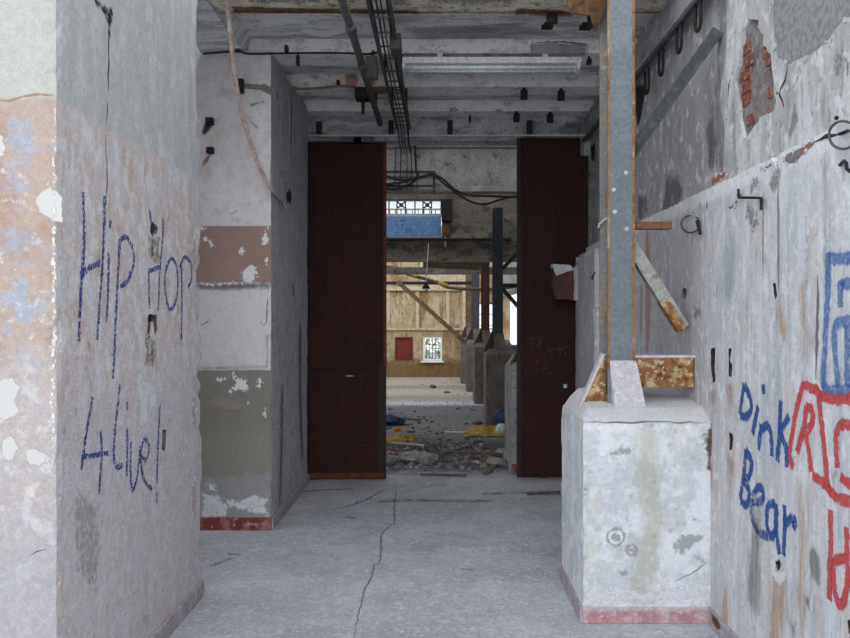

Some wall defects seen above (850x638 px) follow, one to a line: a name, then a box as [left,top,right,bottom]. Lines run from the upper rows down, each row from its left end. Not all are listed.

peeling [727,0,850,143]
peeling [0,137,63,475]
peeling [200,257,268,290]
peeling [216,371,264,393]
crack [324,481,467,638]